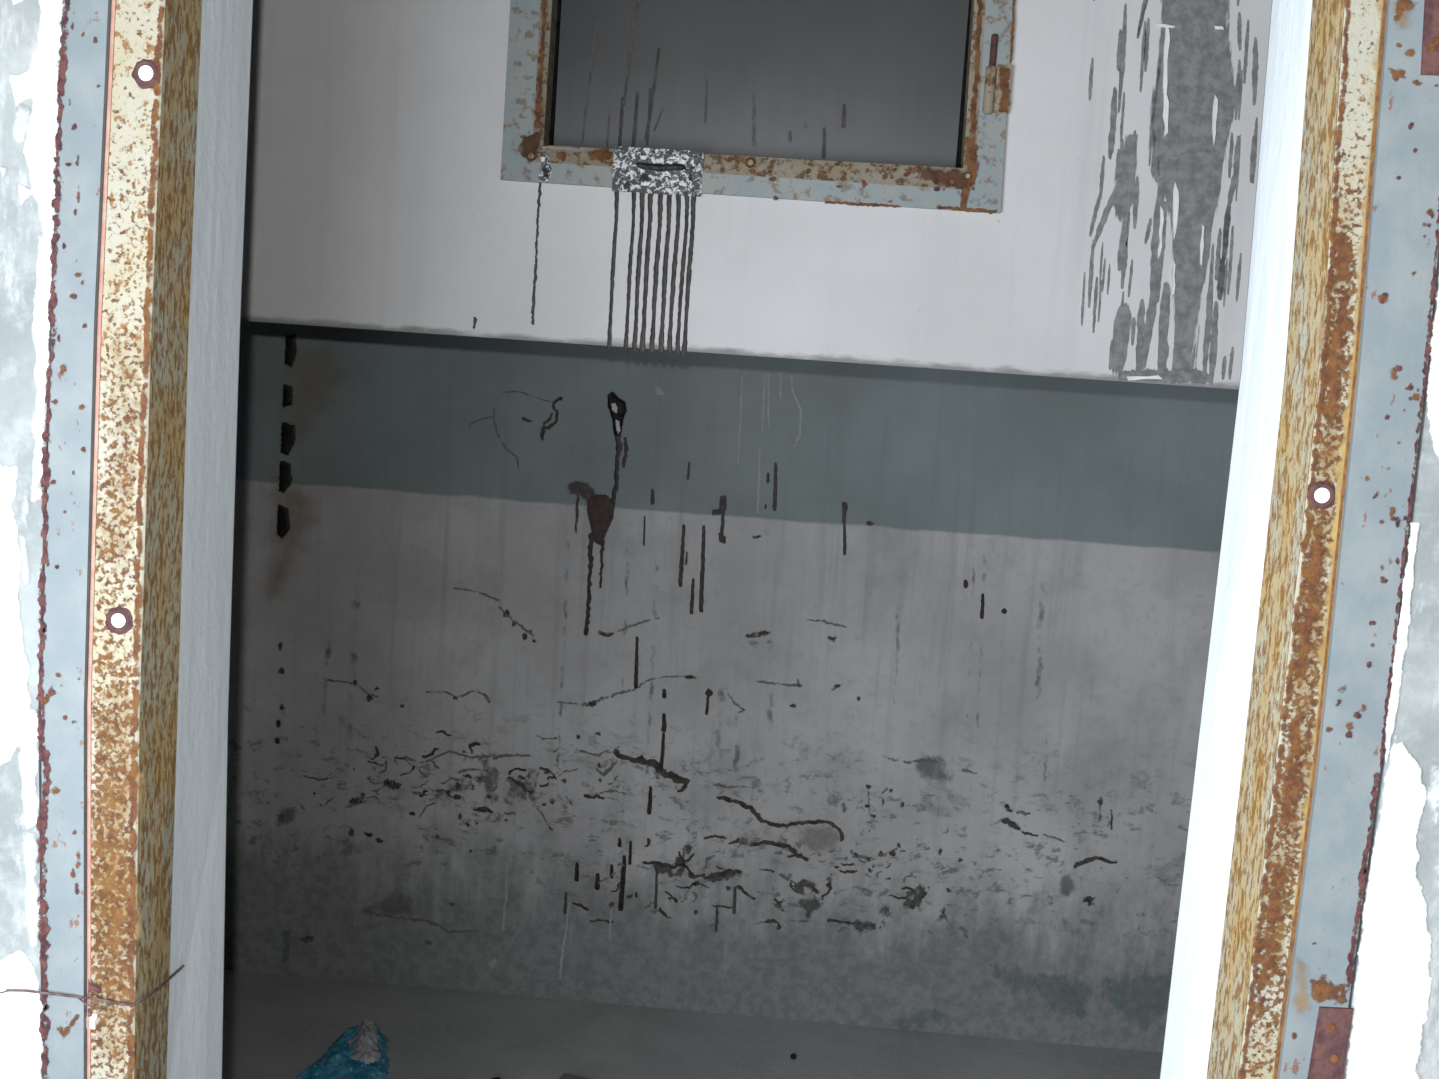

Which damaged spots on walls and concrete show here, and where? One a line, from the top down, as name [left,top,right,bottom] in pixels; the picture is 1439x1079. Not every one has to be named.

rust [520,0,547,162]
damp [531,154,552,325]
damp [607,191,696,354]
rust [806,0,997,214]
rust [998,0,1015,113]
peeling [1081,0,1259,384]
peeling [1427,294,1439,457]
peeling [0,0,62,1079]
rust [36,0,165,1079]
rust [1237,0,1439,1079]
crack [596,749,846,861]
peeling [1346,523,1439,1079]